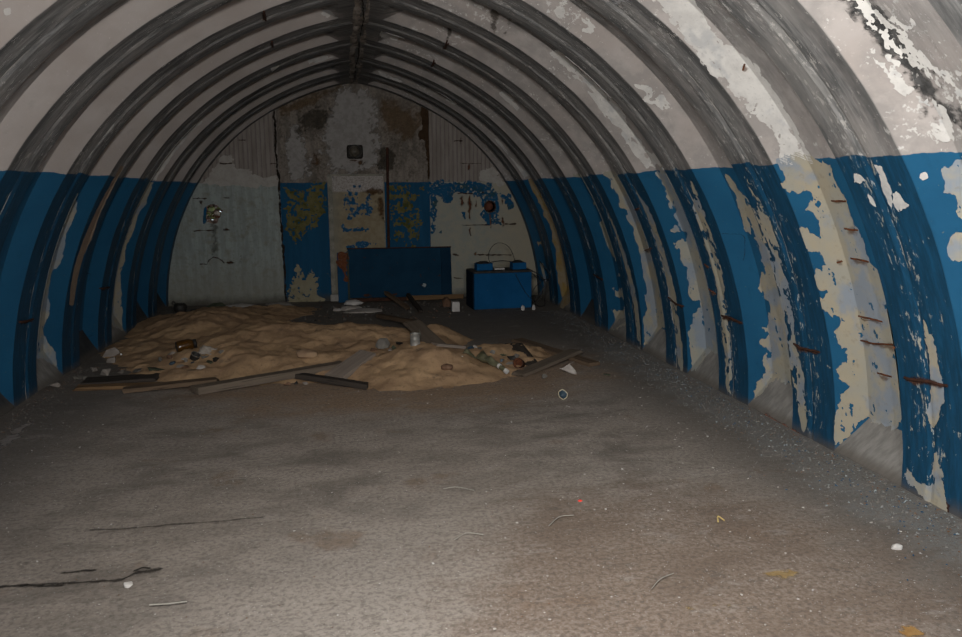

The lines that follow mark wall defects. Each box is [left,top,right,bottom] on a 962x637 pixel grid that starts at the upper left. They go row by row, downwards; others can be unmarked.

peeling [581,18,596,34]
peeling [286,264,326,302]
damp [283,85,396,244]
peeling [341,185,376,253]
peeling [494,138,570,309]
peeling [550,50,743,394]
peeling [658,0,962,445]
peeling [903,442,947,512]